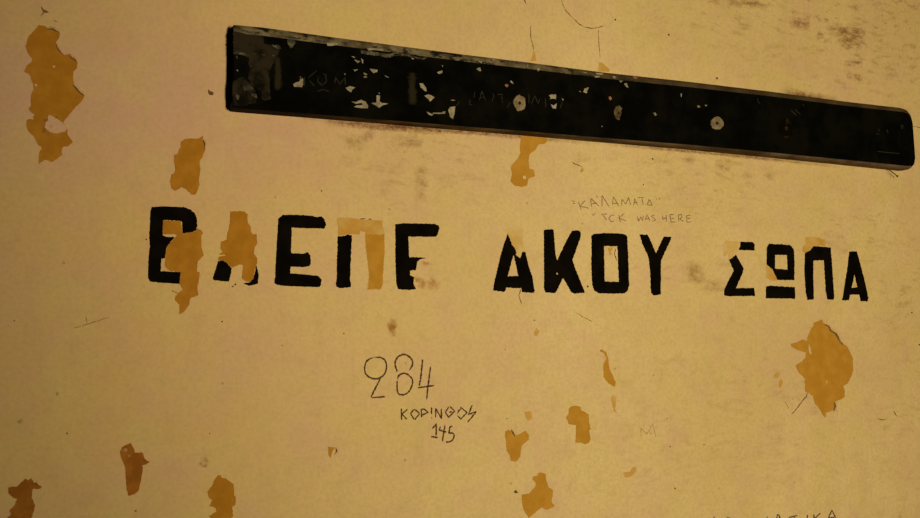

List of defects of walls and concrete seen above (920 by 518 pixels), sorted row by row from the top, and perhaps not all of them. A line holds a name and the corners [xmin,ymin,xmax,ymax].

crack [562,4,602,52]
peeling [24,7,85,163]
peeling [170,136,208,195]
peeling [511,136,547,187]
peeling [163,220,204,314]
peeling [218,211,257,282]
peeling [791,320,853,418]
peeling [566,406,591,444]
peeling [7,478,43,518]
peeling [120,443,149,496]
peeling [207,475,236,518]
peeling [514,472,555,518]